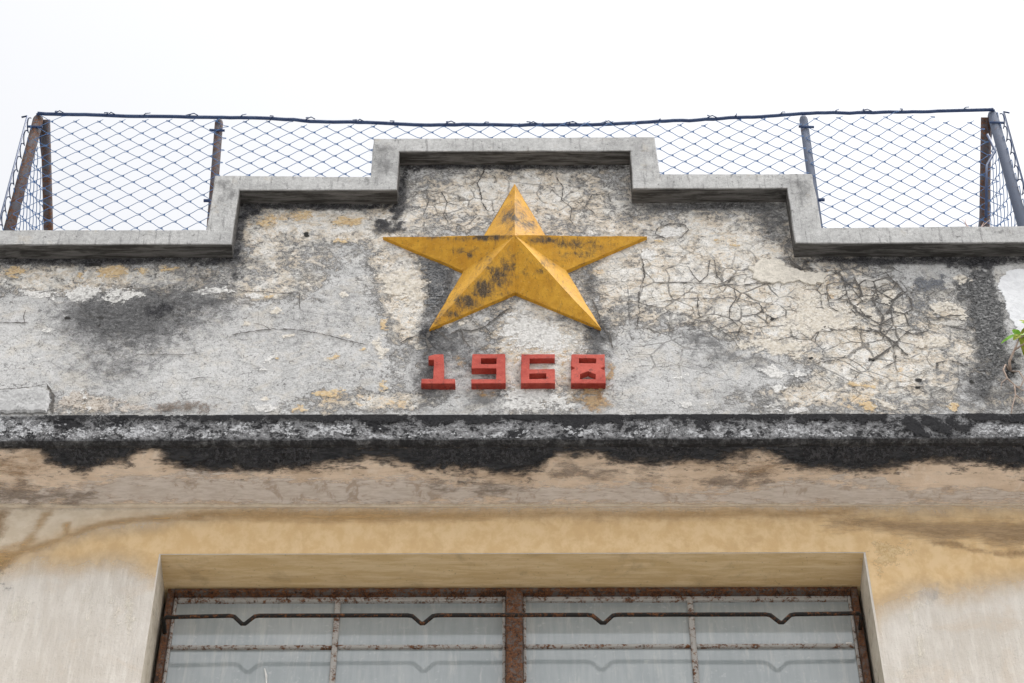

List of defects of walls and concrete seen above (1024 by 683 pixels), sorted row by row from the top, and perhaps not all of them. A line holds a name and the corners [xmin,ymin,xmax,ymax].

crack [412,164,497,223]
crack [556,177,604,226]
water stain [73,290,216,344]
crack [637,257,970,392]
water stain [0,413,1024,607]